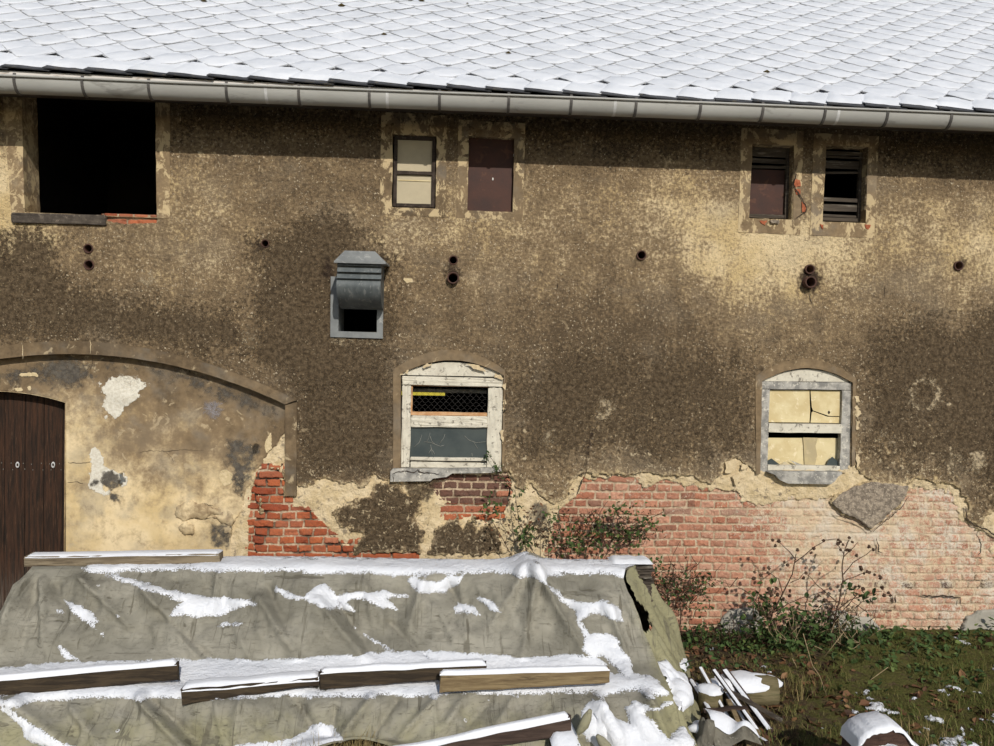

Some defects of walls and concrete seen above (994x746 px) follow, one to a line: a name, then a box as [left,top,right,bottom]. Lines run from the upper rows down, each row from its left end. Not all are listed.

peeling [88,447,128,501]
peeling [98,376,147,419]
leakage [0,209,501,556]
flaking render [174,433,994,633]
leakage [505,341,756,474]
peeling [854,396,862,430]
leakage [863,304,994,503]
crack [965,506,994,535]